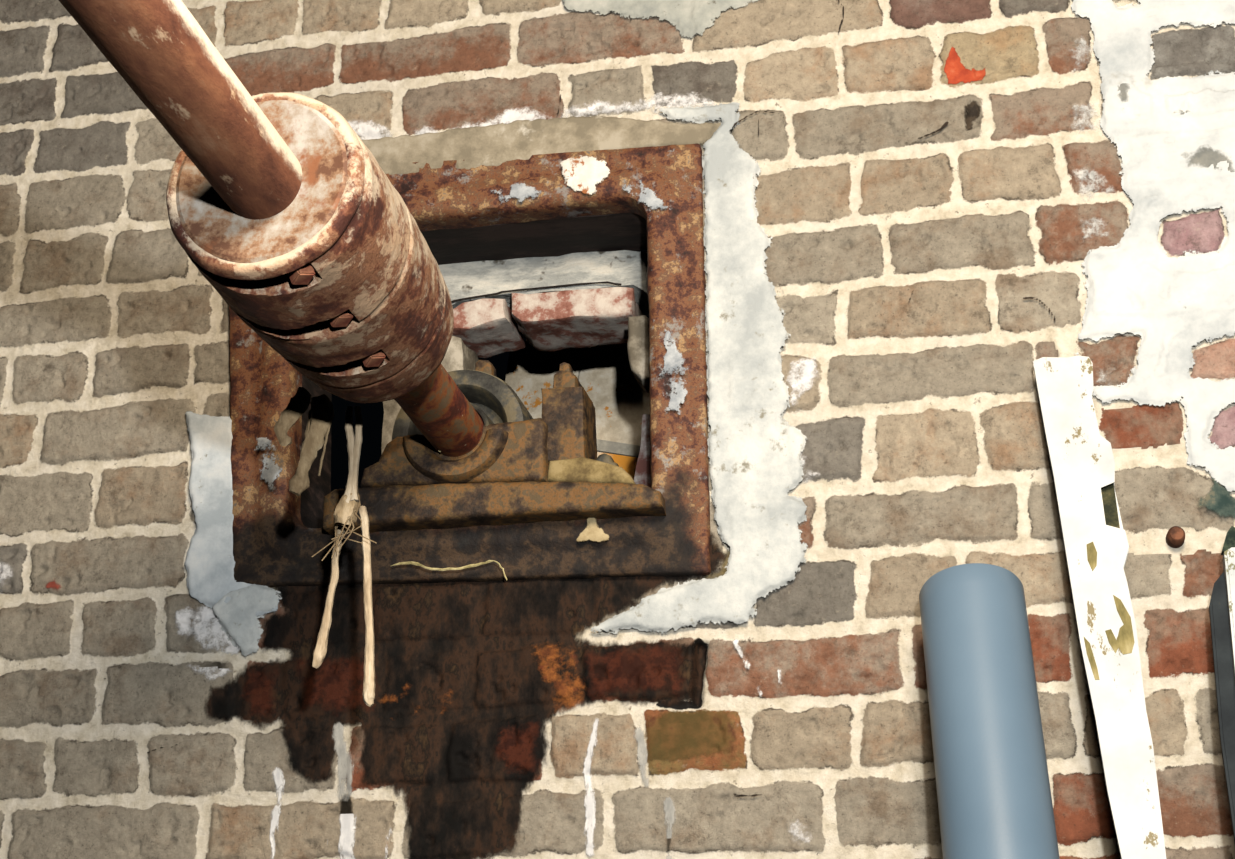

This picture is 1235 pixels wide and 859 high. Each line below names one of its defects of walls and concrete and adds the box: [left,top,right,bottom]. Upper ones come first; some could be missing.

peeling [1071,0,1235,492]
corrosion [538,646,585,706]